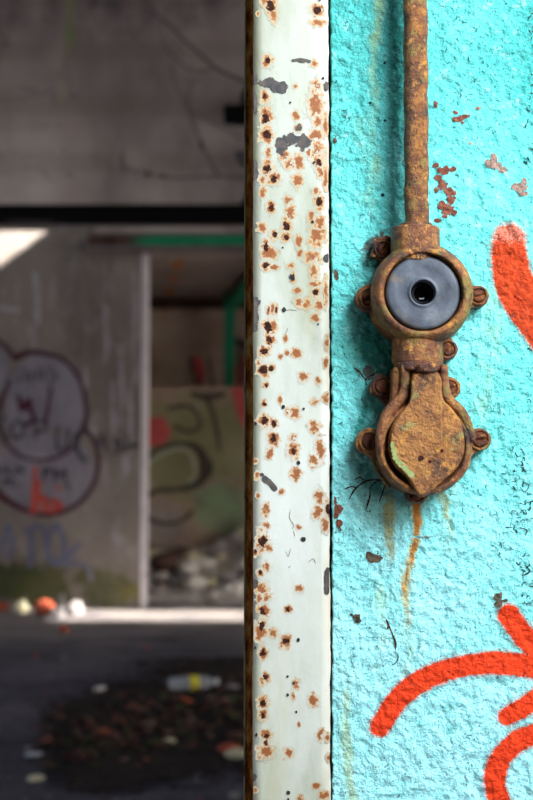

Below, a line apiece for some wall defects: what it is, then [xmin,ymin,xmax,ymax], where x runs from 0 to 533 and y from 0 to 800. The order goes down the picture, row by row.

corrosion [255,0,281,26]
peeling [254,70,291,113]
corrosion [255,56,329,323]
peeling [275,123,312,155]
peeling [432,163,457,223]
peeling [484,152,507,173]
peeling [511,178,529,197]
corrosion [254,301,329,496]
corrosion [310,483,329,535]
corrosion [368,482,460,682]
corrosion [254,491,295,764]
corrosion [290,676,321,709]